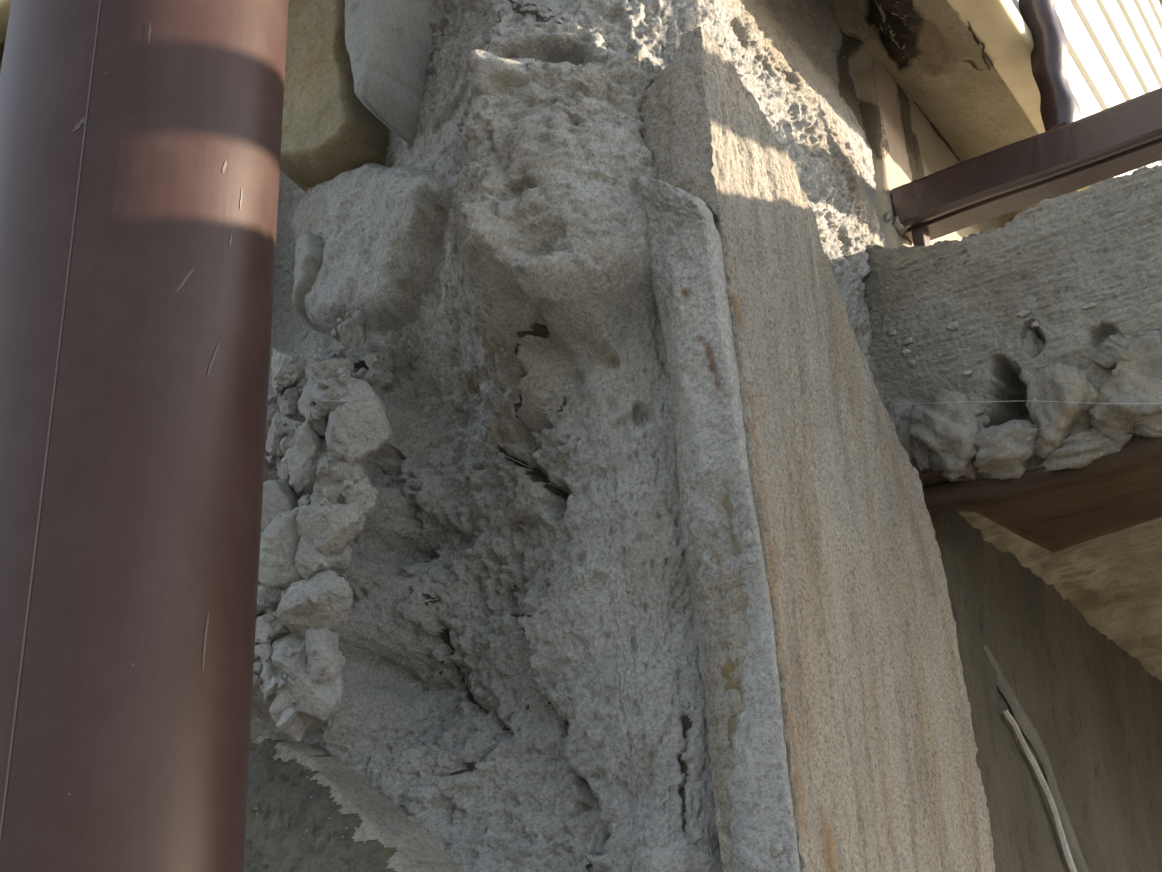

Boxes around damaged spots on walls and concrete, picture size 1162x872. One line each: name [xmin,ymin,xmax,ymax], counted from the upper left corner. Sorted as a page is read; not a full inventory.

crack [514,323,567,419]
spalling [896,310,1162,482]
crack [497,443,569,501]
crack [510,585,532,636]
crack [422,593,569,731]
crack [433,761,481,784]
crack [678,703,693,832]